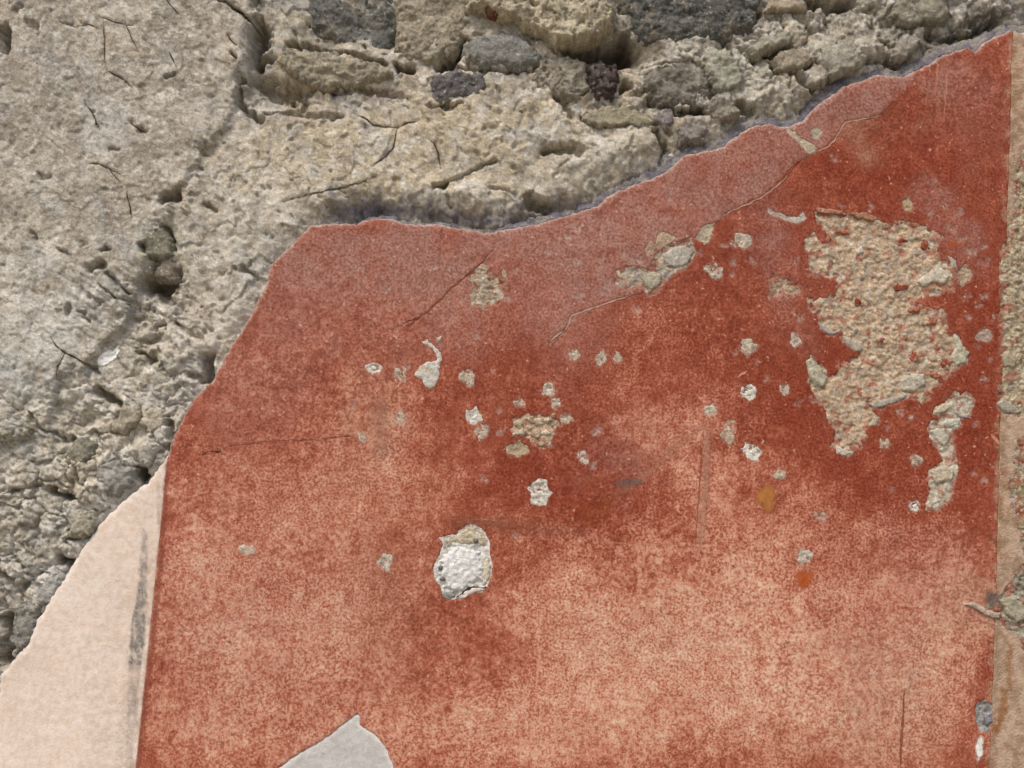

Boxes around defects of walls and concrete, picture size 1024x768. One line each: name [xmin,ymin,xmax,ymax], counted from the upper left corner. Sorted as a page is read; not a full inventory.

crack [60,17,139,87]
crack [90,163,131,215]
crack [283,113,440,202]
crack [713,106,888,225]
flaking render [365,336,442,389]
crack [399,248,494,328]
crack [548,292,641,347]
spalling [613,223,715,297]
spalling [767,196,974,512]
spalling [506,382,573,457]
spalling [527,478,553,506]
spalling [433,524,493,600]